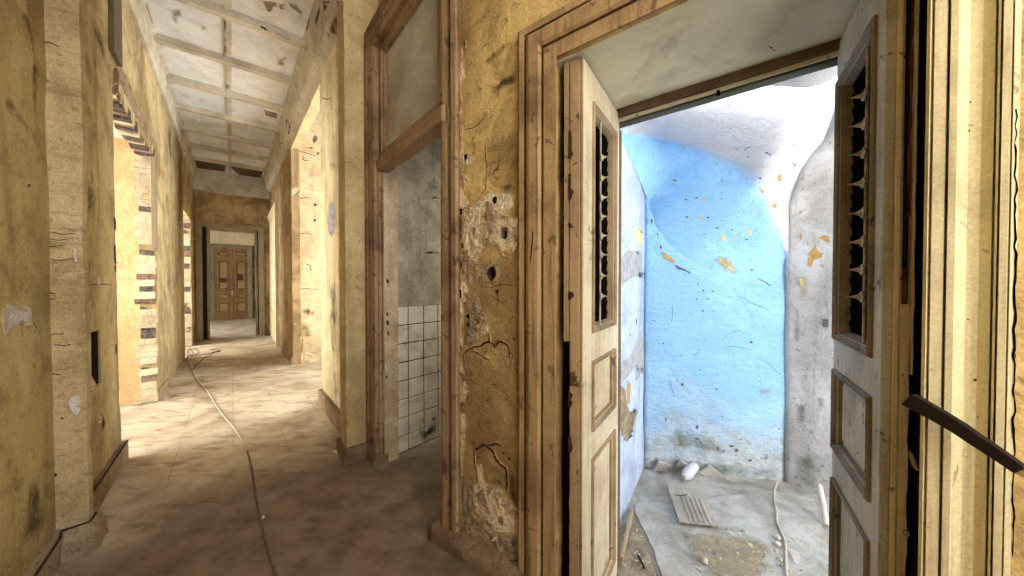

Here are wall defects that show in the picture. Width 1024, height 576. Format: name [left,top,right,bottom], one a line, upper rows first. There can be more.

spalling [460,190,518,294]
peeling [799,232,831,268]
spalling [1,302,34,336]
spalling [61,376,105,431]
crack [460,334,518,493]
peeling [620,319,646,443]
peeling [460,464,518,561]